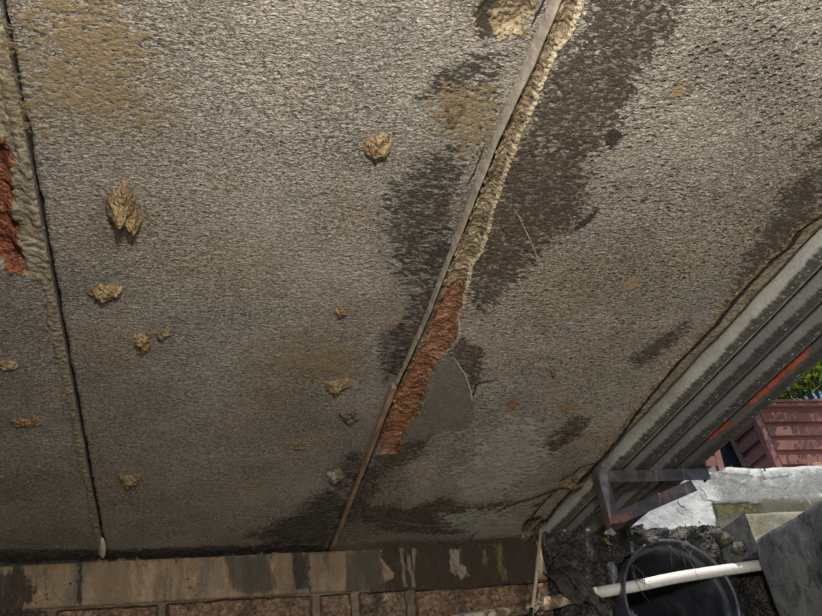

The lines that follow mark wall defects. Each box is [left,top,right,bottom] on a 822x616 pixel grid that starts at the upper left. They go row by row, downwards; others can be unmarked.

crack [3,0,107,551]
damp [376,137,474,382]
damp [415,44,508,107]
damp [444,338,487,387]
spalling [379,0,584,454]
crack [467,114,512,221]
crack [531,0,544,25]
damp [460,0,693,314]
damp [723,131,822,303]
damp [0,413,595,616]